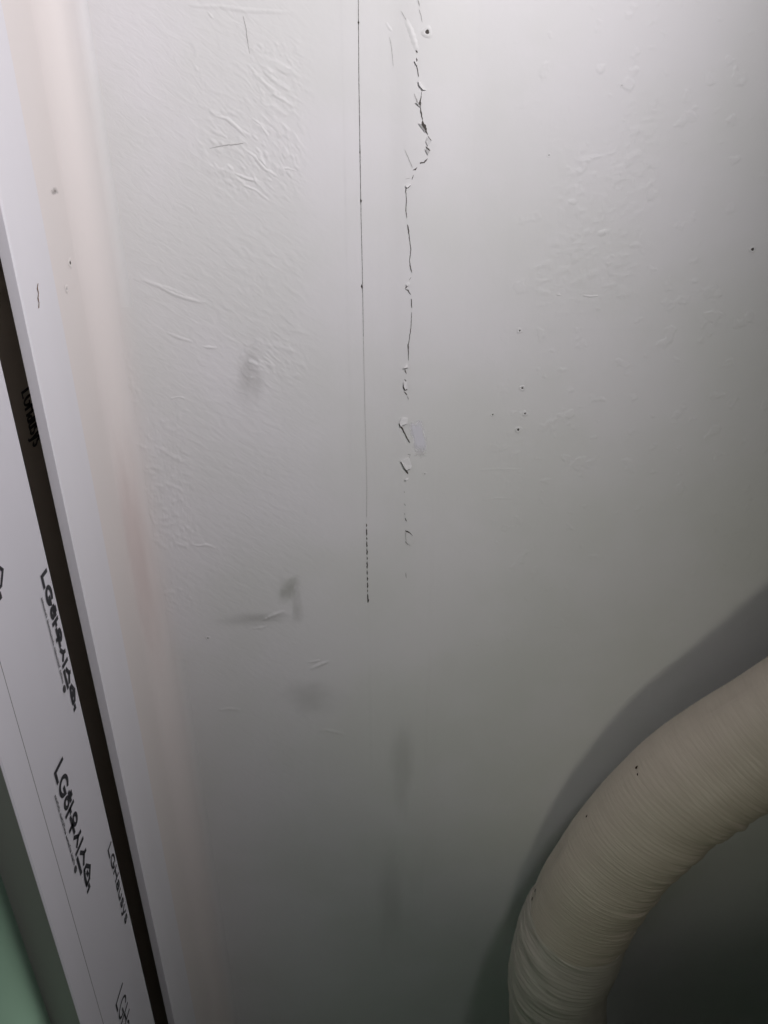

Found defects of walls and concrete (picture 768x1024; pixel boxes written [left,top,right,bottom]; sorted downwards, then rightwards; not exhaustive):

crack [385,0,431,545]